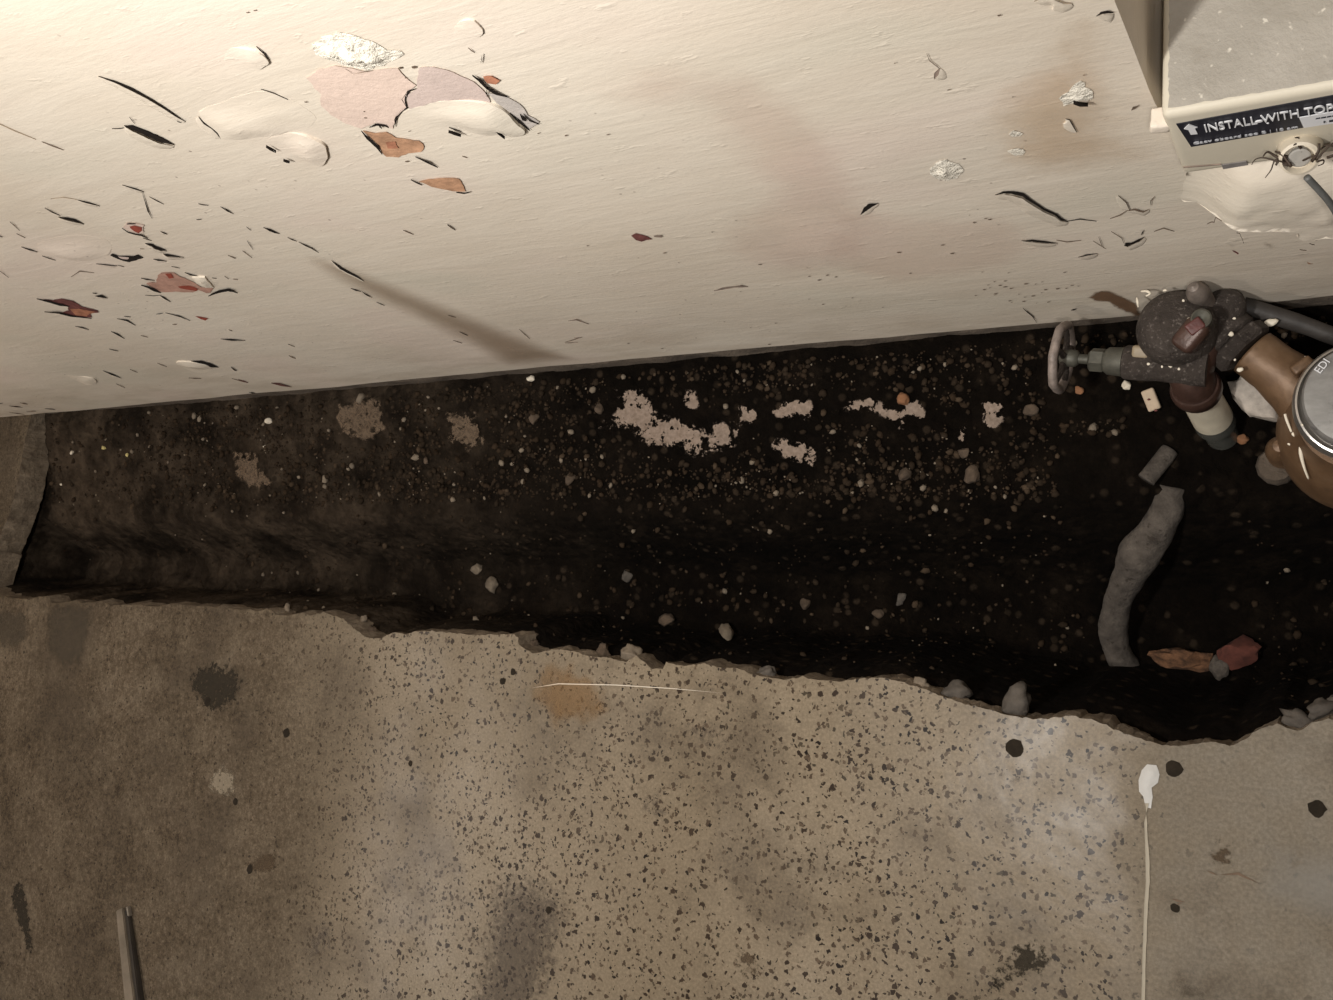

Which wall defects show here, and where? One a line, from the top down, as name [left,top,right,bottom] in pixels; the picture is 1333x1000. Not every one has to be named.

crack [0,124,63,150]
crack [98,76,221,149]
peeling [306,66,539,194]
peeling [122,223,148,239]
crack [995,191,1172,260]
spalling [110,254,143,262]
peeling [38,299,99,319]
peeling [141,272,237,296]
crack [0,185,385,393]
water stain [190,663,243,712]